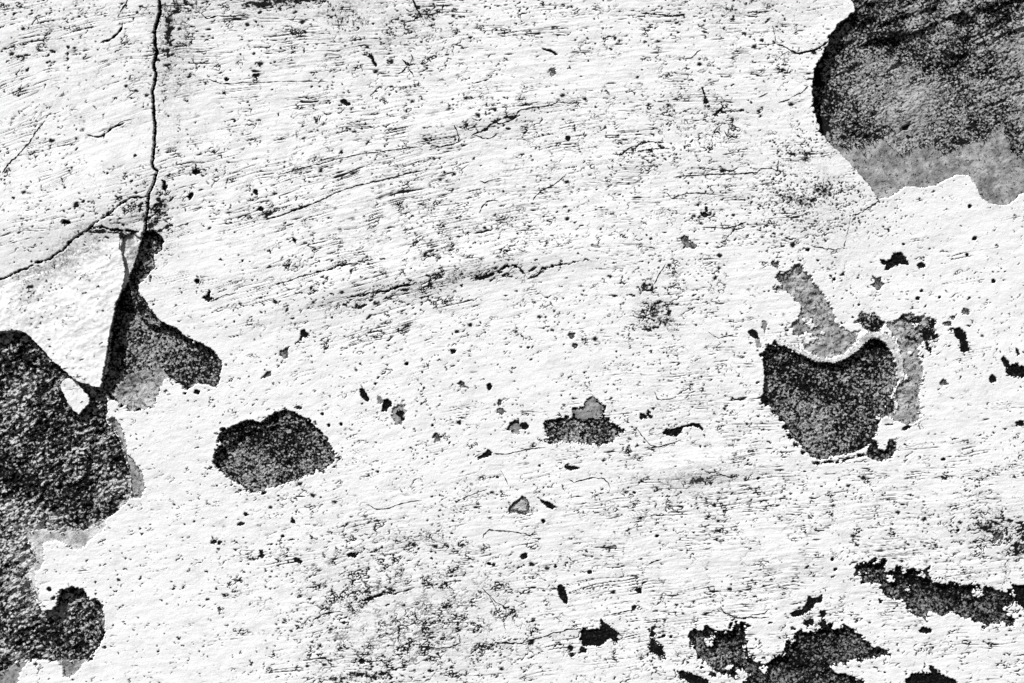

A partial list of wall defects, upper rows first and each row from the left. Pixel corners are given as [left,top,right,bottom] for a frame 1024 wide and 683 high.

crack [0,0,162,280]
spalling [812,0,1024,205]
peeling [872,243,926,290]
spalling [748,261,971,465]
spalling [0,232,223,683]
spalling [210,406,343,493]
peeling [543,396,625,446]
peeling [568,619,619,657]
spalling [677,594,891,683]
spalling [854,558,1024,634]